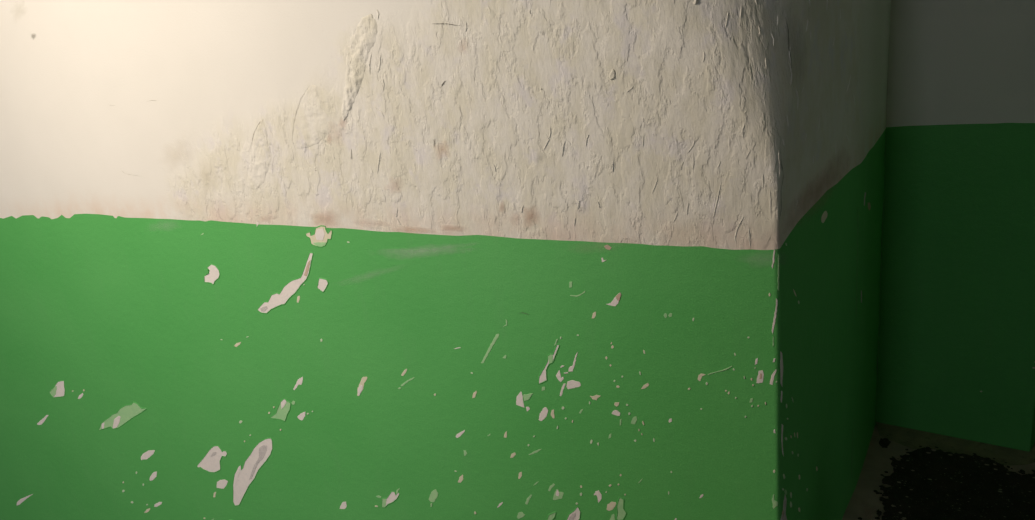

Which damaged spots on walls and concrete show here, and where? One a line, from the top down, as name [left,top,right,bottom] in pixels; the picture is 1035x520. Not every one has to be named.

peeling [204,264,220,285]
peeling [257,225,333,314]
peeling [50,380,85,399]
peeling [516,337,600,429]
peeling [99,402,147,431]
peeling [612,402,644,435]
flaking render [197,377,313,506]
peeling [136,450,157,486]
peeling [375,488,400,508]
peeling [517,481,627,520]